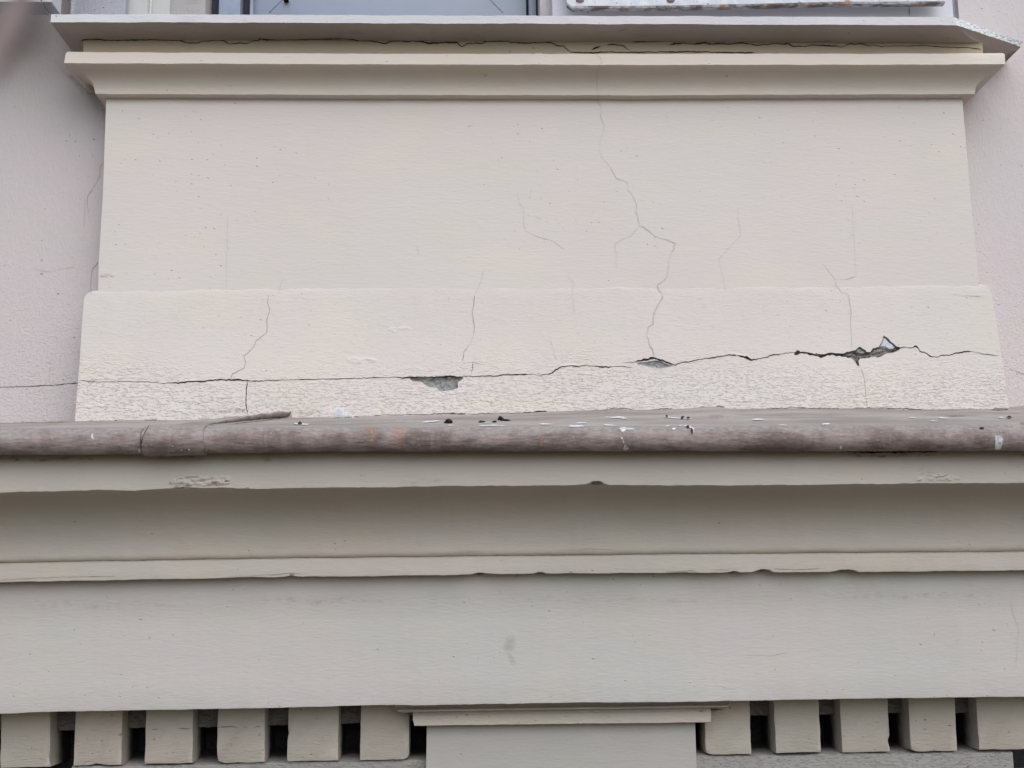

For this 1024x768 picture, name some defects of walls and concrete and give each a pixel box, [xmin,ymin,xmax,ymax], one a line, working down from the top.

crack [82,37,270,45]
crack [15,39,979,412]
flaking render [794,335,901,366]
flaking render [637,360,672,368]
crack [894,344,1023,374]
flaking render [410,377,464,391]
crack [375,403,492,416]